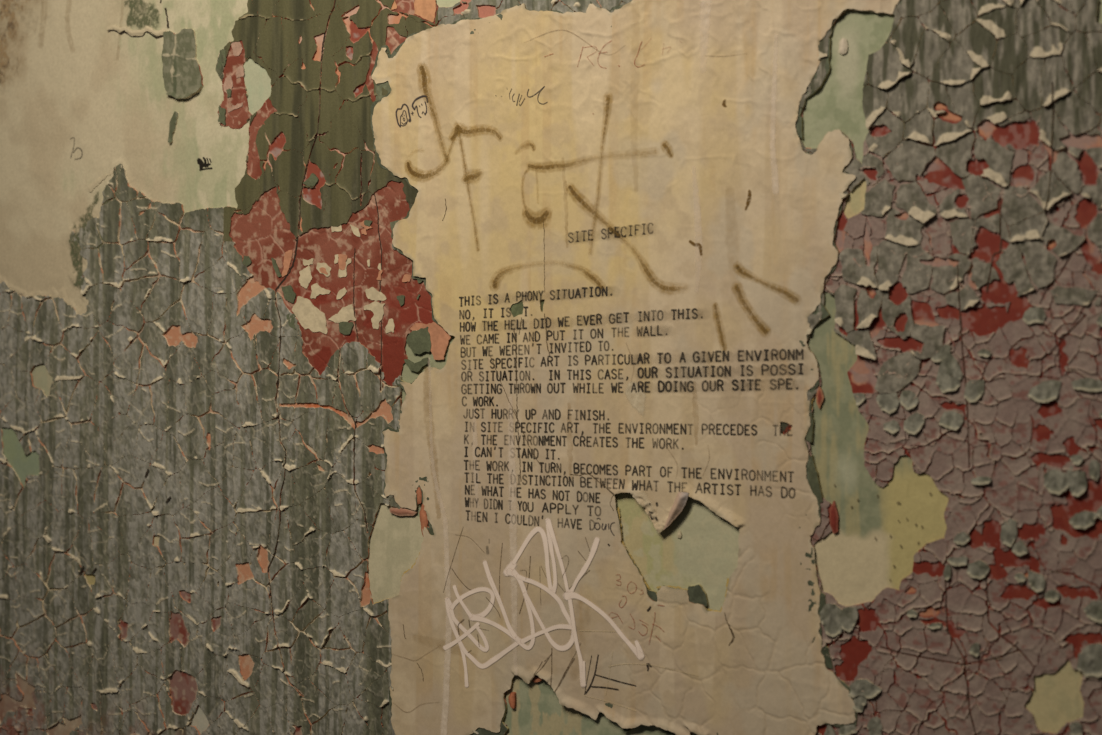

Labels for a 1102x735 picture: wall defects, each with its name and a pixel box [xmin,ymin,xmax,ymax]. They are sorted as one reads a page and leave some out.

crack [1045,86,1054,215]
crack [267,0,336,695]
peeling [0,0,632,735]
crack [337,153,382,528]
peeling [799,0,1102,735]
crack [957,264,970,468]
crack [986,198,1002,292]
crack [1040,252,1073,303]
crack [1037,315,1086,362]
peeling [608,492,739,612]
peeling [504,675,669,735]
crack [880,576,1035,734]